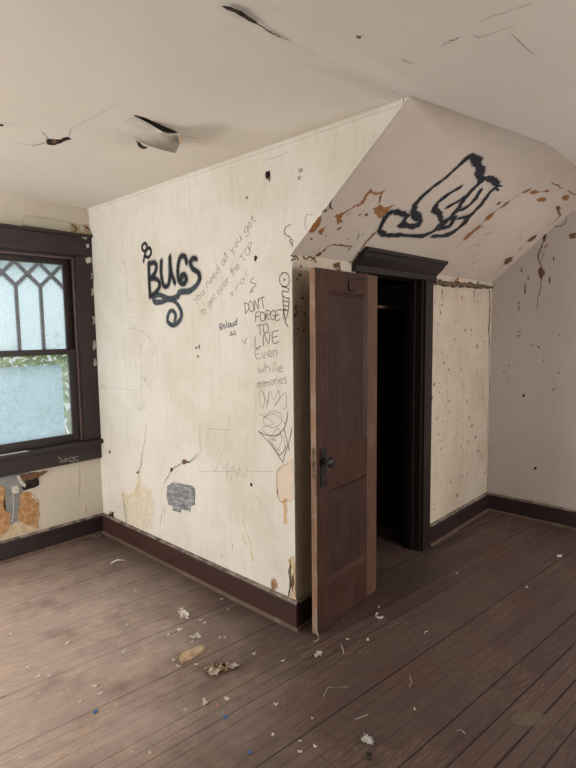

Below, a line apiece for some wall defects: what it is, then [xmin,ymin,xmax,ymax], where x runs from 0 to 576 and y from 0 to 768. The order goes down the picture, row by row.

peeling [115,115,193,153]
peeling [309,189,394,240]
peeling [530,183,575,202]
crack [499,206,576,307]
spalling [0,471,48,541]
crack [161,447,201,518]
peeling [276,458,294,523]
spalling [288,556,296,600]